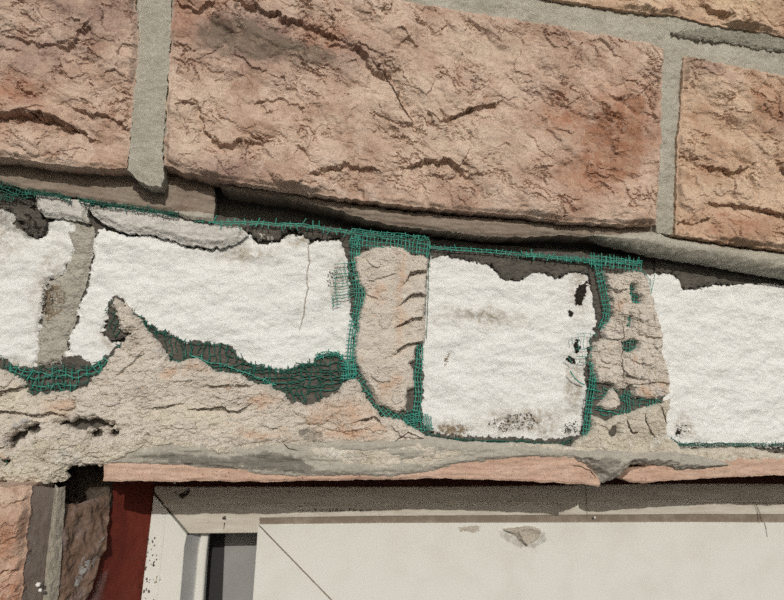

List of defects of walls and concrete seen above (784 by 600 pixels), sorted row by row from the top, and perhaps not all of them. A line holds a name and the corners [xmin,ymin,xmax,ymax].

spalling [0,180,179,239]
crack [299,239,310,329]
flaking render [0,215,784,509]